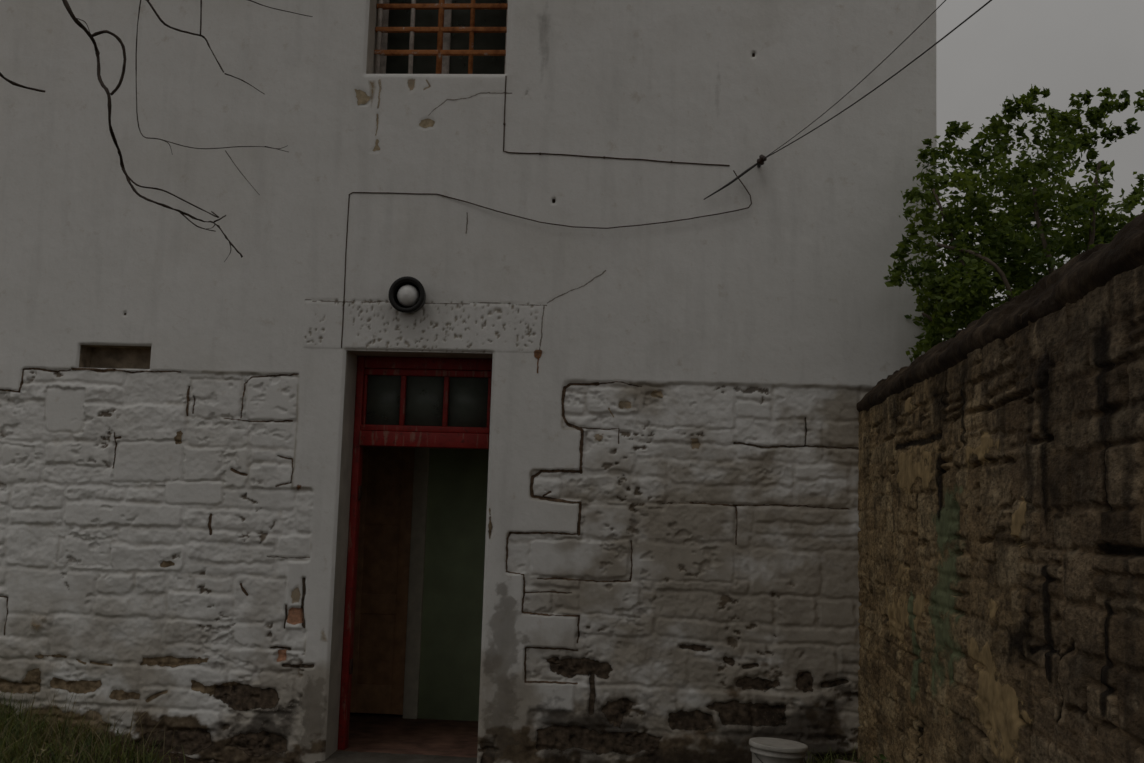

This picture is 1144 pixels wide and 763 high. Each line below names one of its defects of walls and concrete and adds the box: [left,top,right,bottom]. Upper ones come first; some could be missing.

spalling [284,578,306,629]
spalling [0,654,168,735]
spalling [140,656,209,668]
spalling [191,680,279,711]
spalling [270,646,314,668]
spalling [536,644,786,755]
spalling [796,671,849,692]
water stain [539,700,846,763]